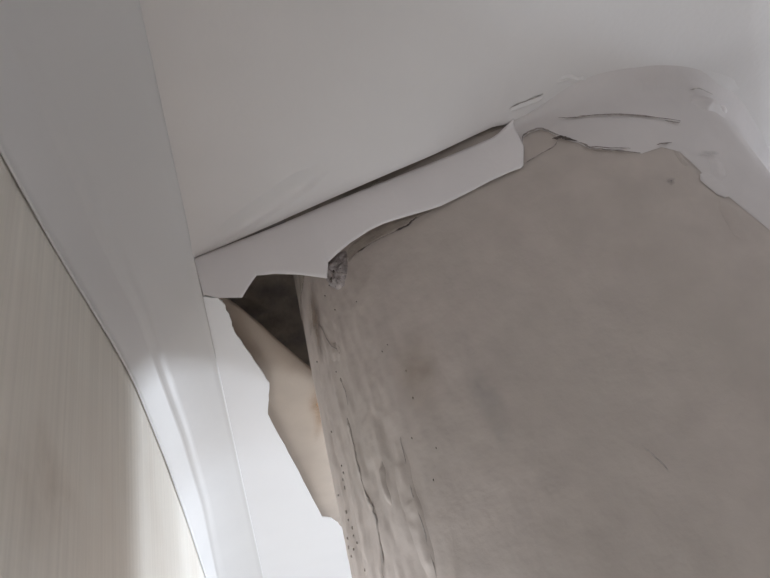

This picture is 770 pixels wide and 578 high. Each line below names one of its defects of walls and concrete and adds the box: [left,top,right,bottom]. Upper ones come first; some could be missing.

crack [522,113,680,165]
peeling [194,119,524,368]
crack [340,378,384,578]